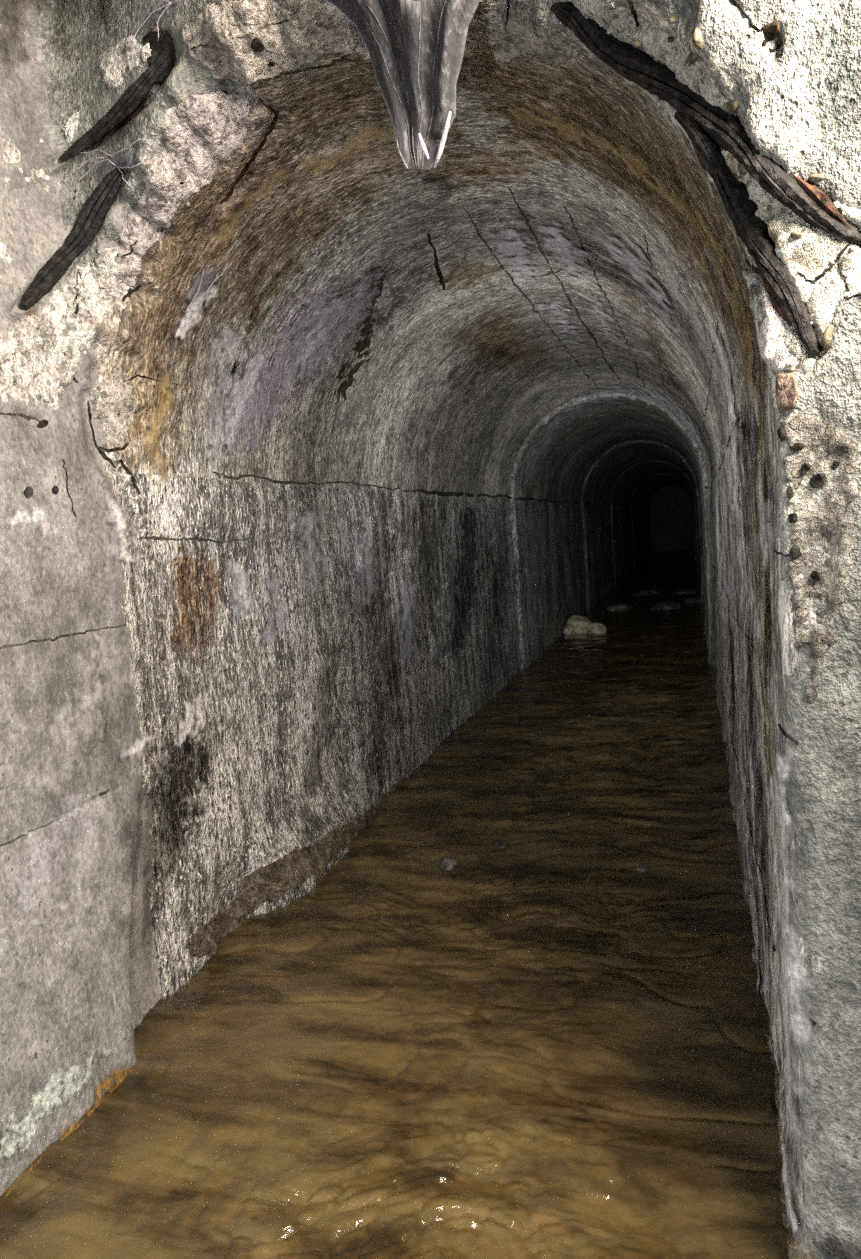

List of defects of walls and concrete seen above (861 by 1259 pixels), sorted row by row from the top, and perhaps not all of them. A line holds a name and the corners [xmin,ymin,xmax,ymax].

crack [503,0,511,30]
crack [627,0,639,26]
crack [732,0,783,55]
spalling [0,0,371,410]
damp [175,287,218,338]
damp [222,354,265,444]
damp [285,293,345,383]
peeling [333,267,395,401]
damp [485,222,680,352]
spalling [490,0,861,704]
damp [521,324,761,993]
damp [1,1050,131,1157]